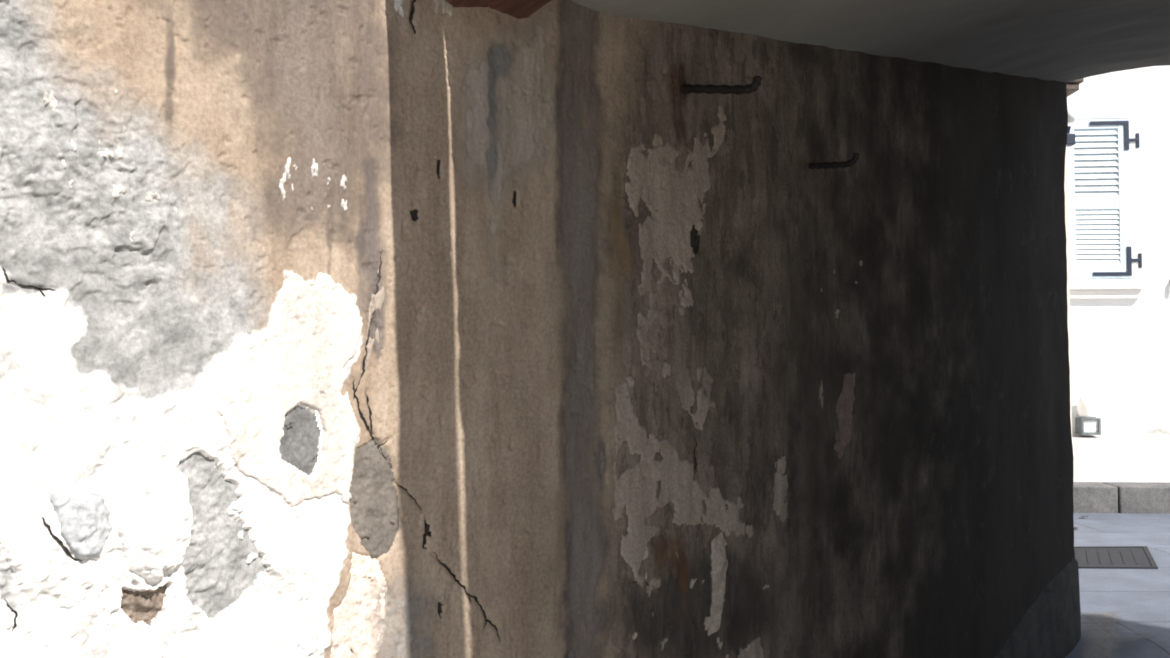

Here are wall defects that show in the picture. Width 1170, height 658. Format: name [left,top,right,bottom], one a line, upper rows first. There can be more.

peeling [394,0,404,17]
peeling [43,90,58,111]
peeling [98,139,123,160]
peeling [279,157,348,211]
peeling [625,105,726,431]
crack [353,255,423,511]
peeling [176,270,399,658]
peeling [612,377,764,658]
flaking render [0,546,23,611]
flaking render [121,580,171,626]
crack [433,552,501,642]